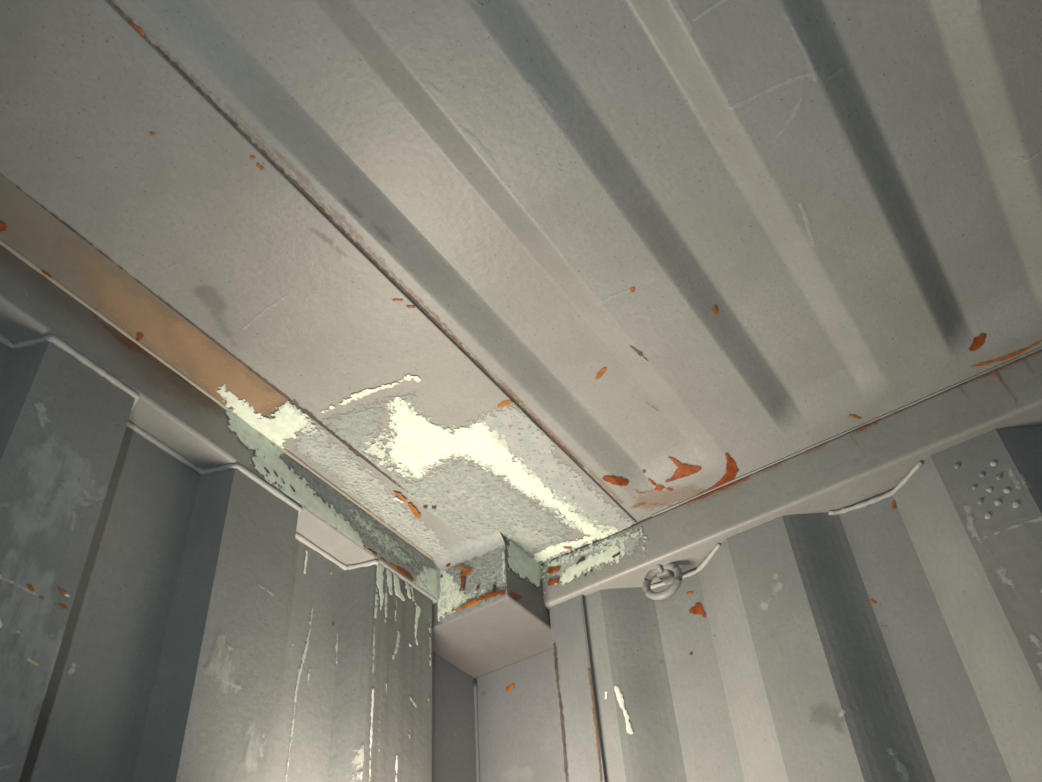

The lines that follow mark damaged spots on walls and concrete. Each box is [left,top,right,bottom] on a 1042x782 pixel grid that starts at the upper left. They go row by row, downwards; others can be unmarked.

corrosion [93,316,187,383]
corrosion [969,333,986,351]
corrosion [947,340,1042,393]
peeling [217,375,648,624]
corrosion [602,457,701,508]
corrosion [670,453,782,507]
corrosion [451,590,522,612]
corrosion [687,591,706,617]